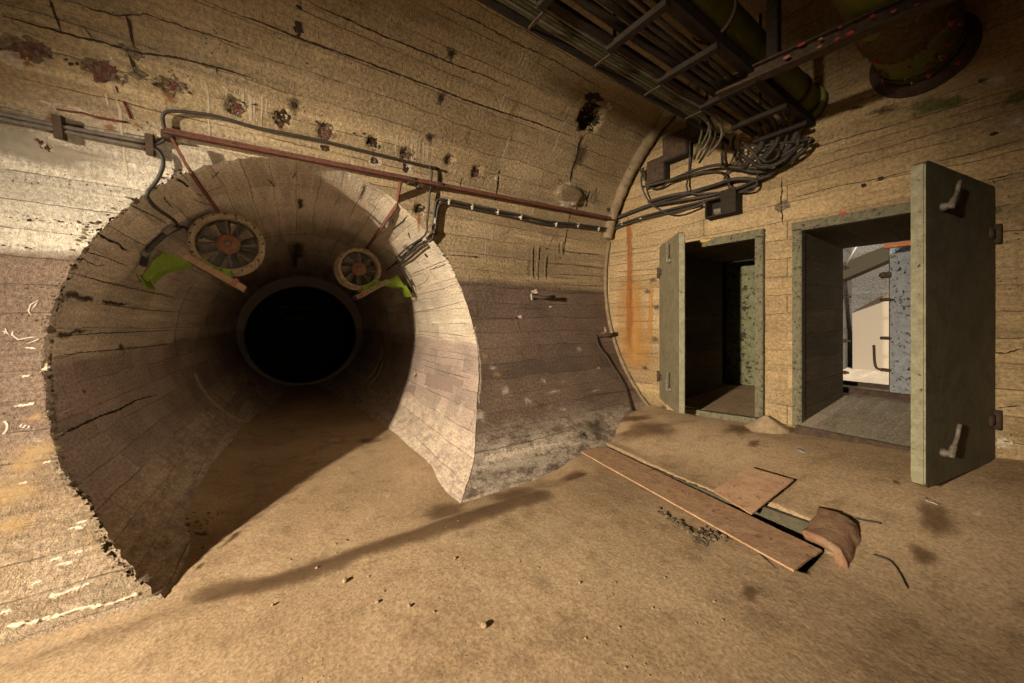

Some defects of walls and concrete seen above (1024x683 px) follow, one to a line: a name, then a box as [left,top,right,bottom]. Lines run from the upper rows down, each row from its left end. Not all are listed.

spalling [575,92,612,139]
crack [129,172,225,224]
crack [204,0,658,379]
rust [624,222,652,364]
spalling [14,169,187,585]
leakage [485,439,568,469]
peeling [49,582,90,599]
leakage [196,490,549,601]